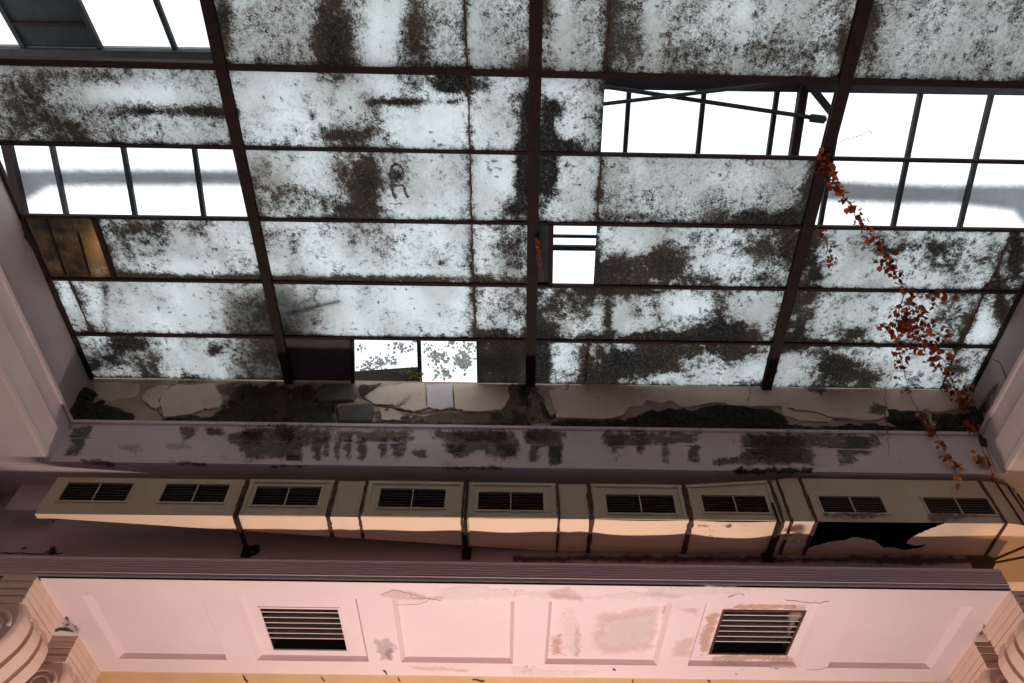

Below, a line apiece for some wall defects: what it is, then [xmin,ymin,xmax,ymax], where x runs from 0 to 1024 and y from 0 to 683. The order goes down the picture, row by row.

damp [64,426,117,467]
peeling [92,382,237,419]
damp [180,382,426,468]
peeling [336,383,510,425]
damp [432,383,566,471]
damp [603,429,700,462]
peeling [527,384,967,424]
damp [712,433,814,476]